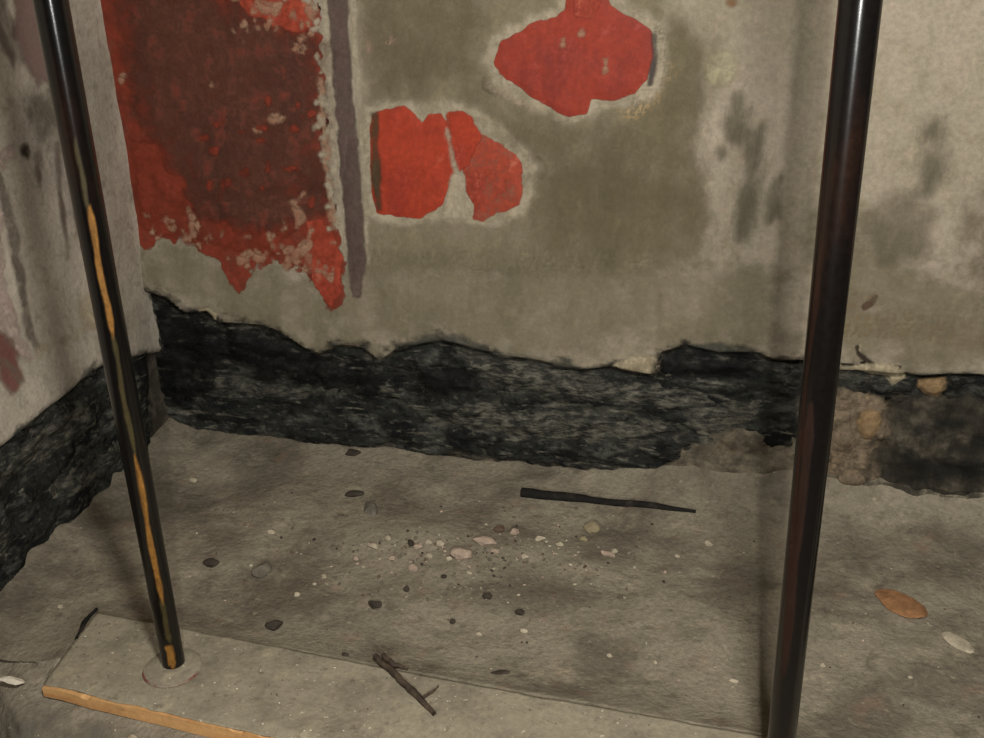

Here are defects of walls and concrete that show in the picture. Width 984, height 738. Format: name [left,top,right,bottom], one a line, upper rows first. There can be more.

peeling [482,0,673,124]
peeling [100,0,347,311]
peeling [362,99,538,227]
leakage [727,99,761,238]
flaking render [0,207,47,392]
flaking render [133,290,803,471]
spalling [828,363,984,499]